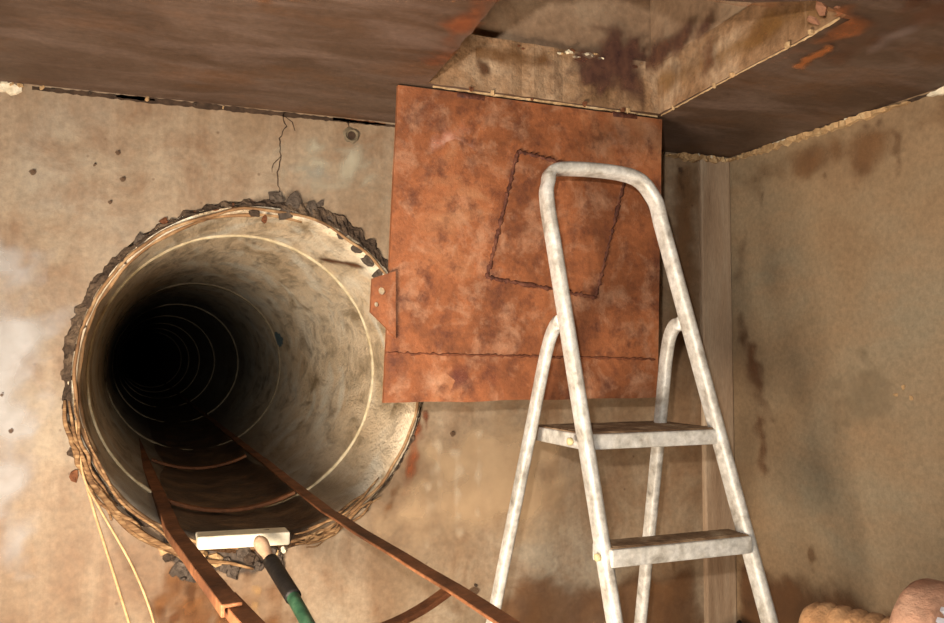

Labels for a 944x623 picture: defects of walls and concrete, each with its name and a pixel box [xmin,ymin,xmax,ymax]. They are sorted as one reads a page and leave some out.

peeling [0,81,24,96]
spalling [433,1,841,117]
leakage [574,17,709,100]
corrosion [794,9,867,68]
crack [32,86,395,192]